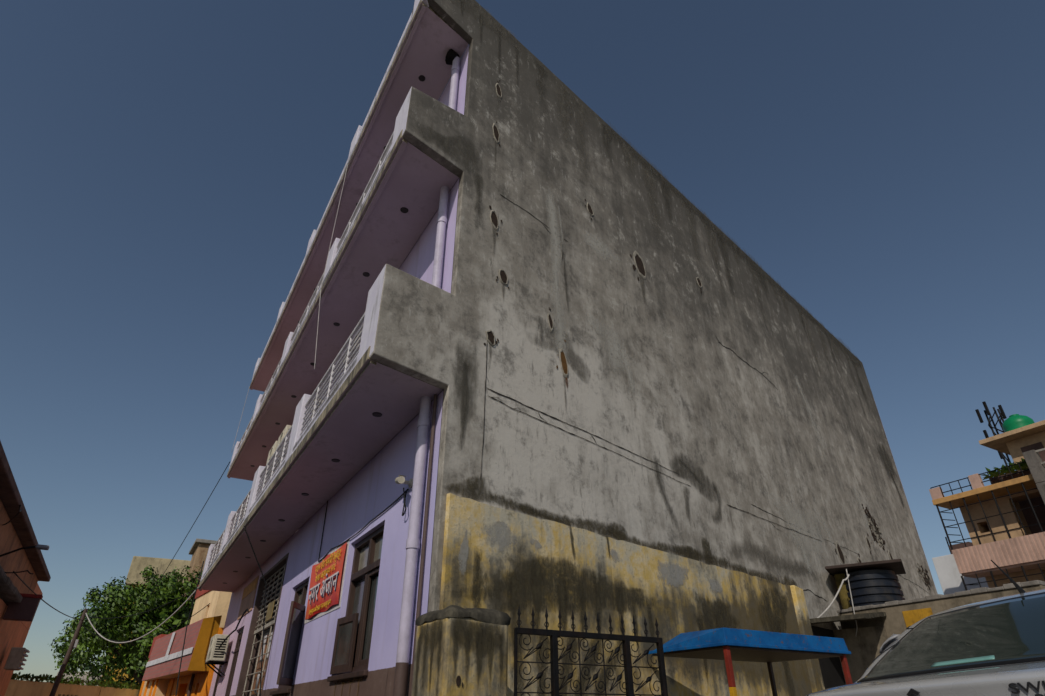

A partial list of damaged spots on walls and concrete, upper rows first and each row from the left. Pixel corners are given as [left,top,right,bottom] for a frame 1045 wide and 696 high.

leakage [672,457,721,521]
leakage [880,447,904,507]
leakage [415,477,834,696]